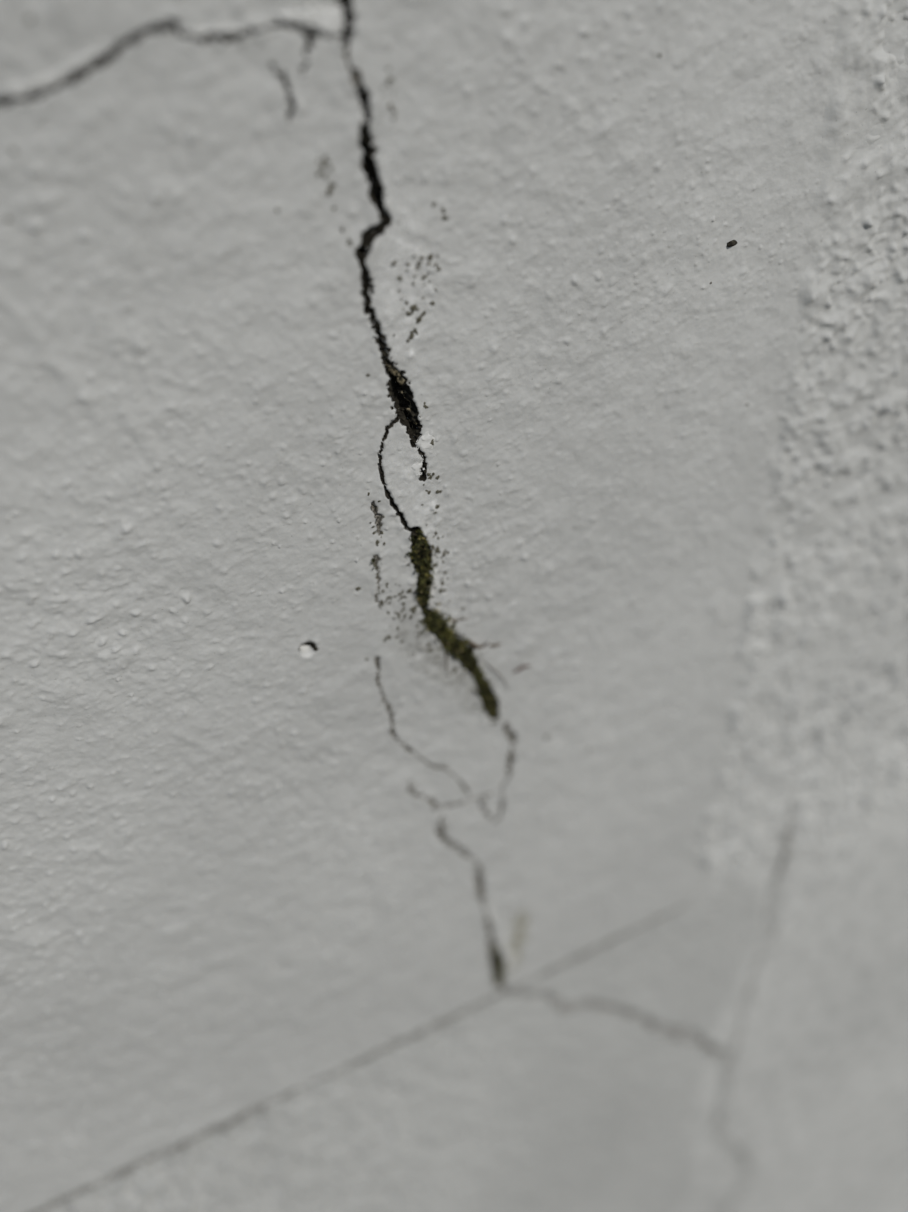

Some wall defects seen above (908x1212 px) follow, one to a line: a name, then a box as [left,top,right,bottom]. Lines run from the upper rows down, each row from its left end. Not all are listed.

crack [0,0,498,719]
crack [35,656,735,1212]